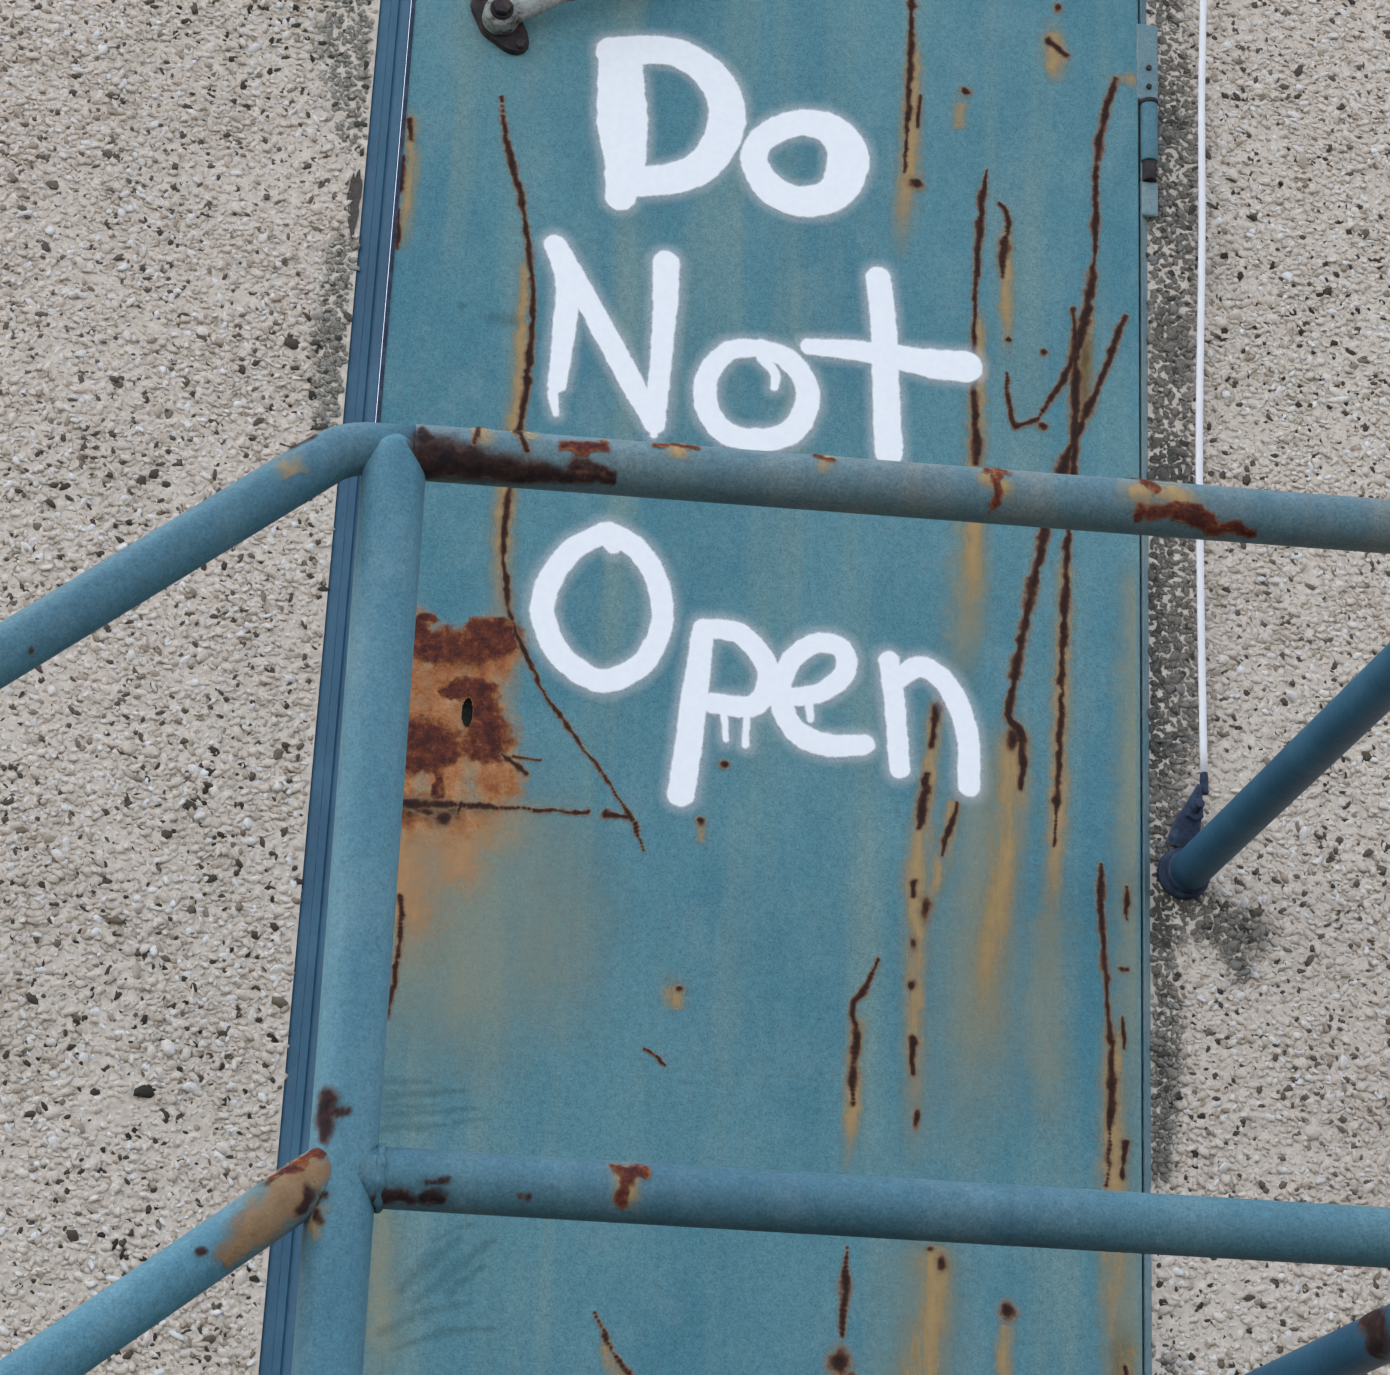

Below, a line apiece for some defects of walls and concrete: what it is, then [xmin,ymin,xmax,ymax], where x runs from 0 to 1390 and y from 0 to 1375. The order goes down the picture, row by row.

rust [408,426,617,485]
rust [1128,478,1257,539]
rust [394,611,631,958]
rust [905,701,959,1089]
rust [913,1109,921,1130]
rust [308,1191,328,1238]
rust [997,1301,1017,1375]
rust [1358,1308,1388,1359]